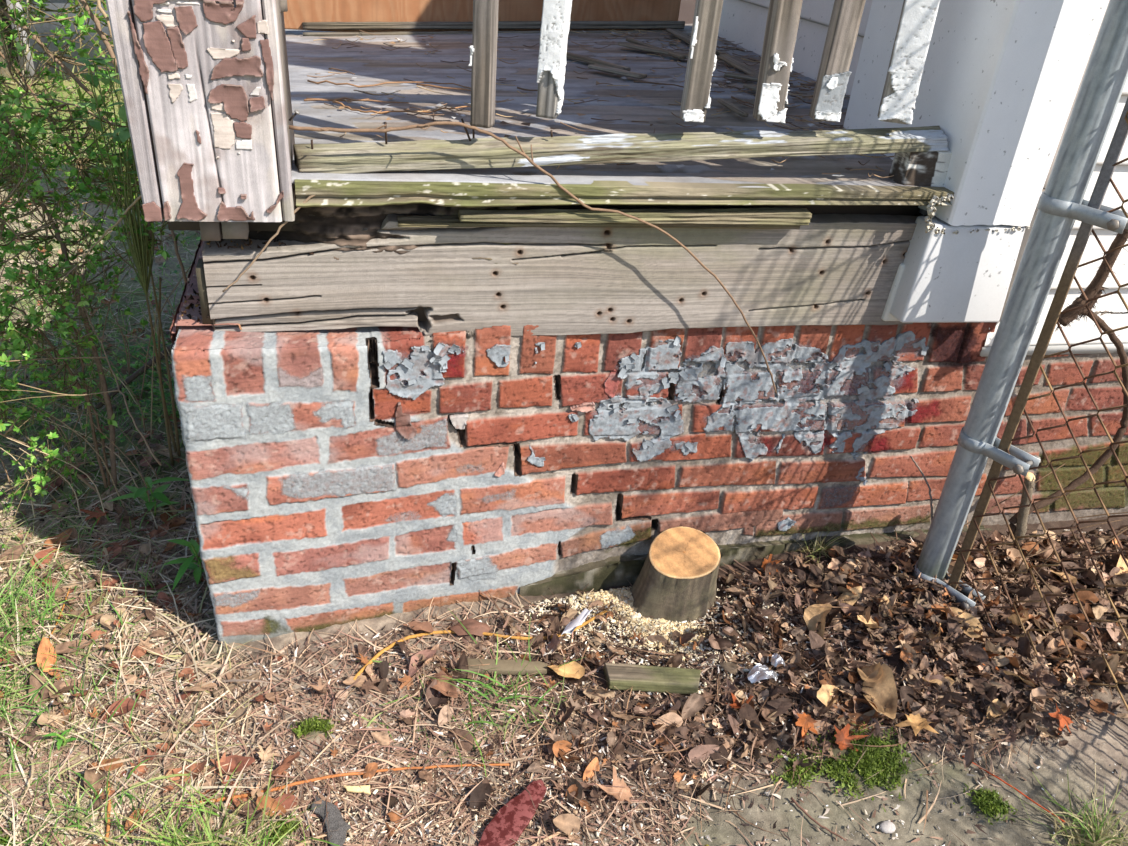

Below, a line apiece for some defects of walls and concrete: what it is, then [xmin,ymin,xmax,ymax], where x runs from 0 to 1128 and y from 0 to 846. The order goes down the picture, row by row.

peeling [127,0,274,159]
peeling [142,162,284,222]
crack [366,335,397,427]
peeling [382,343,464,440]
peeling [486,344,511,367]
crack [553,375,561,400]
peeling [568,331,929,486]
crack [448,414,522,477]
crack [570,473,578,494]
crack [615,493,658,530]
crack [450,546,476,585]